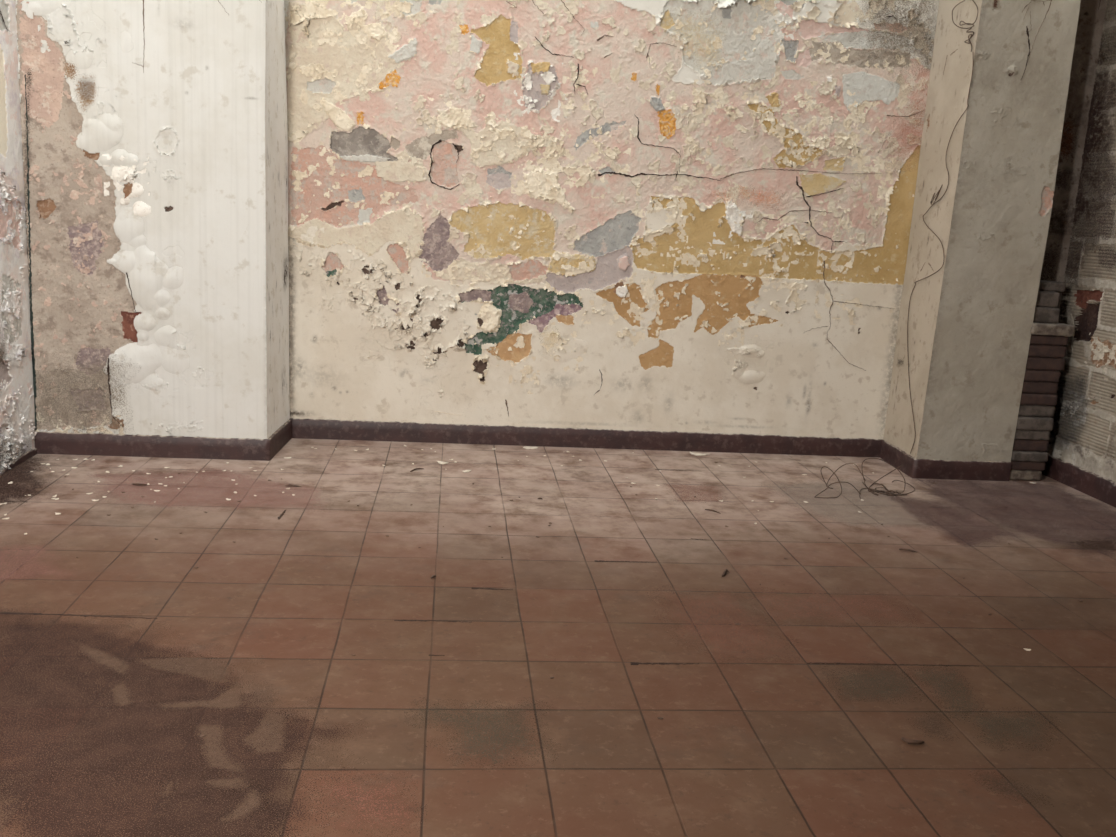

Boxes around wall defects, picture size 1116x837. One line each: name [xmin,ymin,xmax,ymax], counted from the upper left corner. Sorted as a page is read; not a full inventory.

peeling [0,0,178,473]
peeling [284,0,938,394]
crack [598,114,895,371]
water stain [1040,0,1116,289]
water stain [1048,370,1090,453]